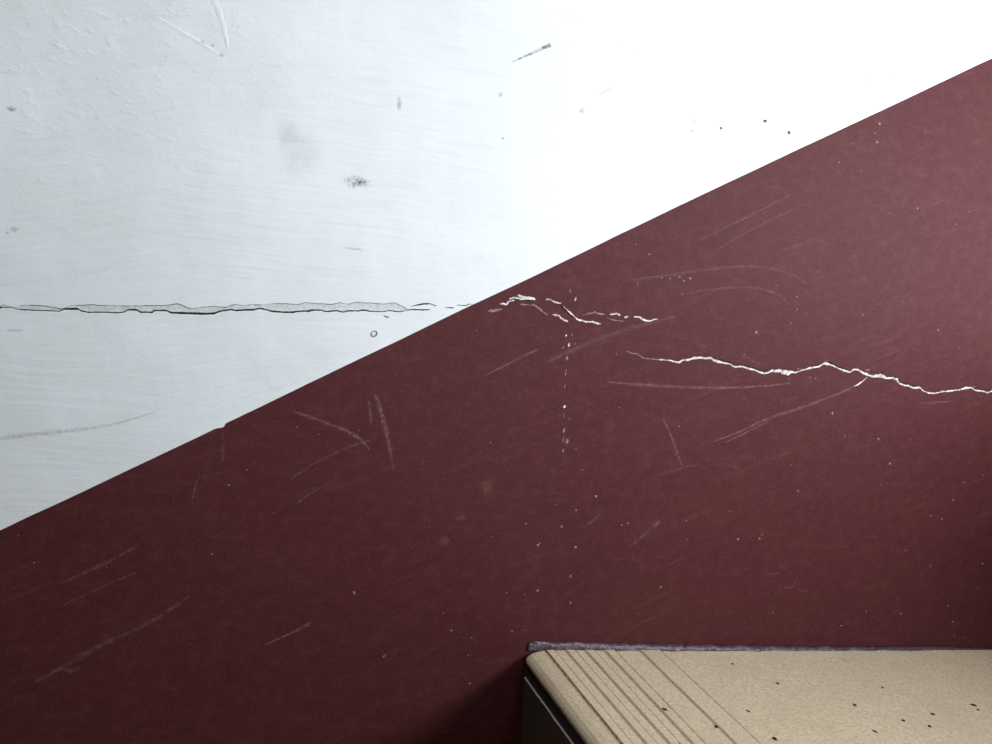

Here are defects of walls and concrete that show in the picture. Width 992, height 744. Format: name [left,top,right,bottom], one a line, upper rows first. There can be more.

crack [0,288,657,452]
crack [627,351,992,394]